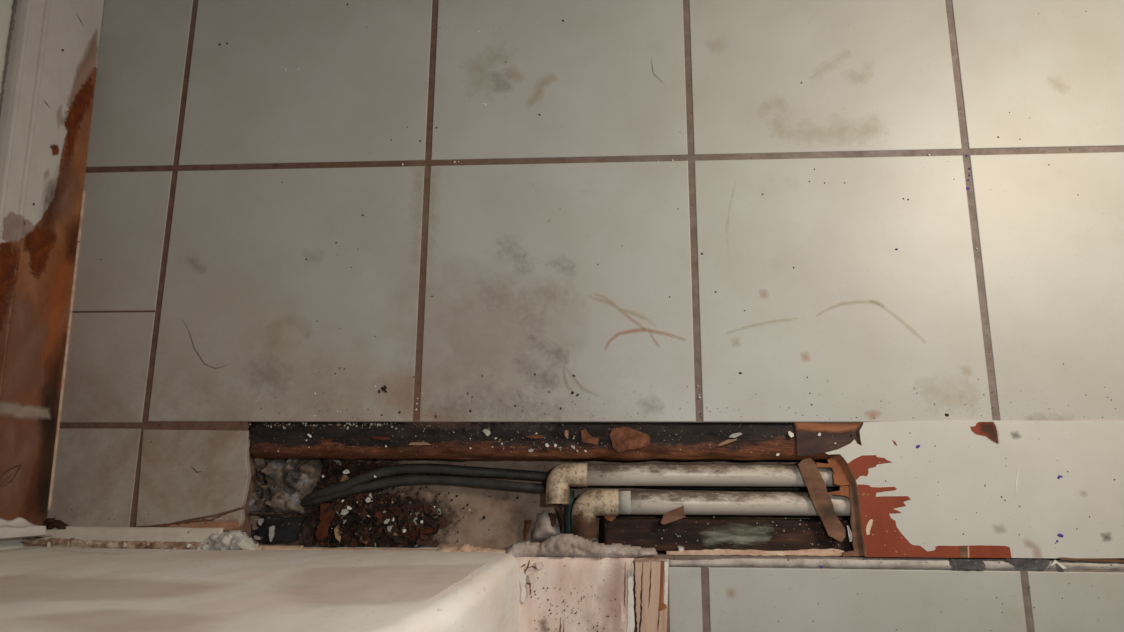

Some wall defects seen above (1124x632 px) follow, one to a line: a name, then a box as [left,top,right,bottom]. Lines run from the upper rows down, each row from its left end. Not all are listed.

peeling [0,66,203,550]
peeling [970,422,998,443]
peeling [254,519,275,542]
peeling [847,455,1067,569]